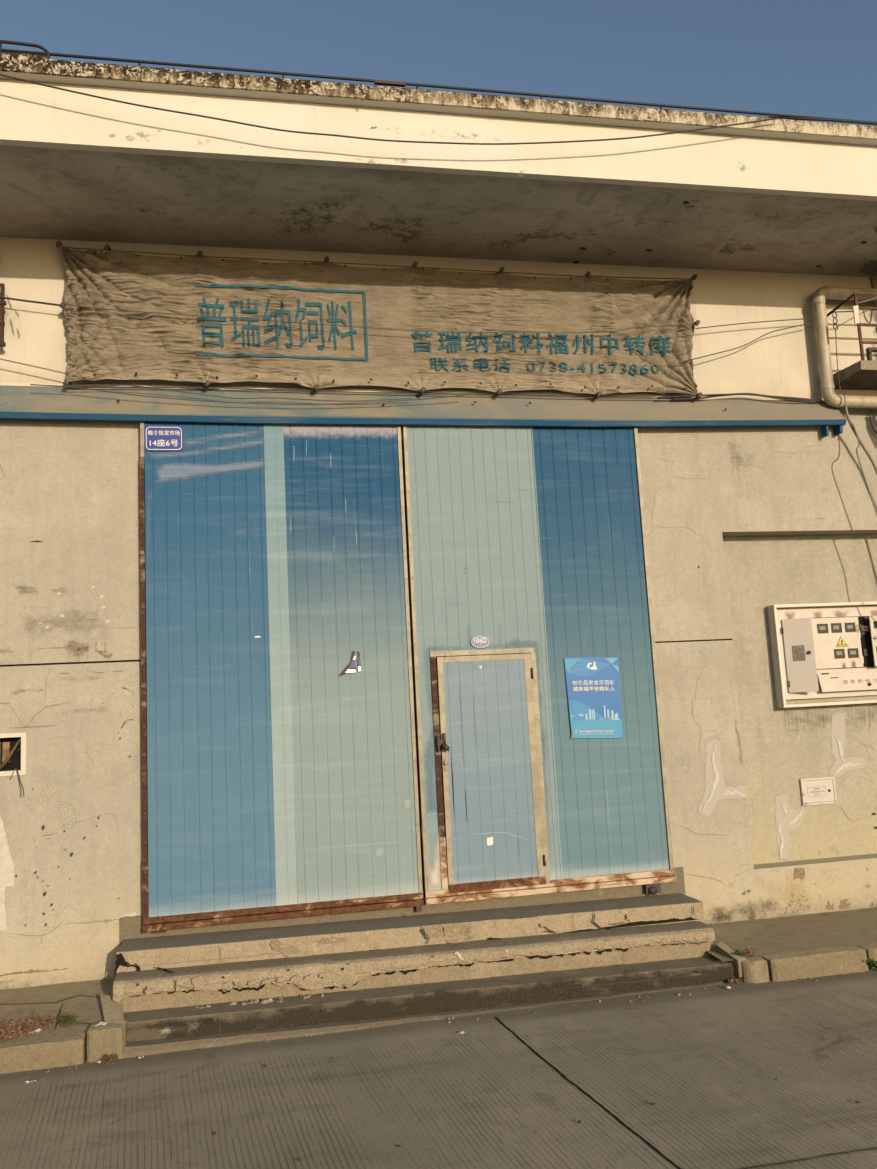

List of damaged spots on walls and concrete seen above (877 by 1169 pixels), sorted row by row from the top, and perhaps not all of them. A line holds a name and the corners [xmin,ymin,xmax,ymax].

crack [121,911,629,1001]